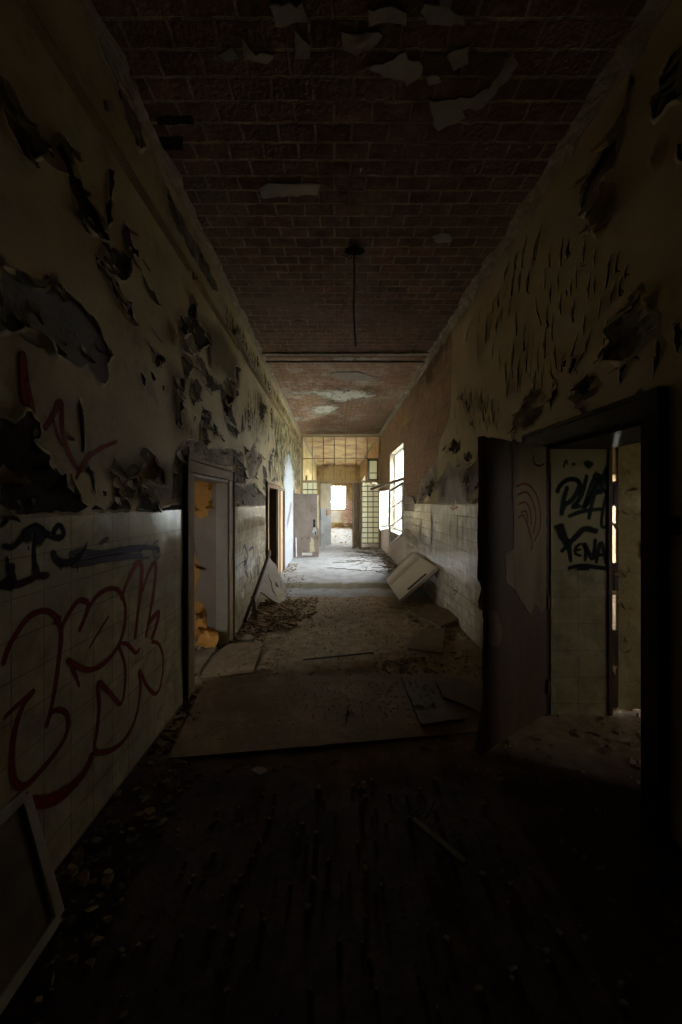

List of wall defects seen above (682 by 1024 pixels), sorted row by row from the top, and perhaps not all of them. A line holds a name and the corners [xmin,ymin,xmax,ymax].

peeling [571,69,637,234]
peeling [648,44,682,125]
peeling [0,133,275,522]
water stain [224,305,376,568]
spalling [508,282,682,439]